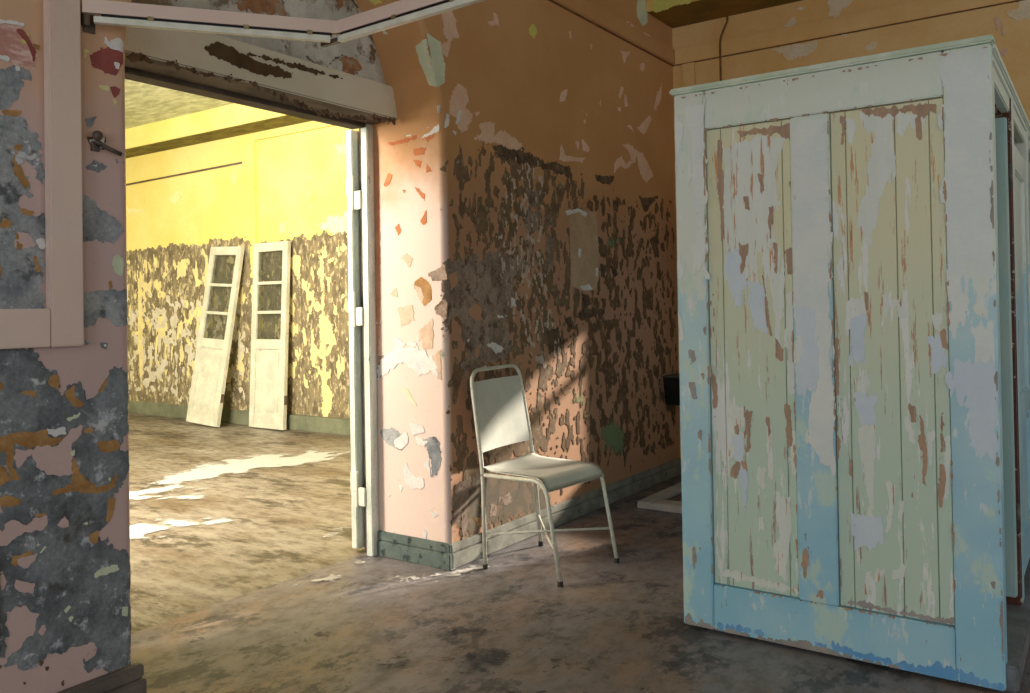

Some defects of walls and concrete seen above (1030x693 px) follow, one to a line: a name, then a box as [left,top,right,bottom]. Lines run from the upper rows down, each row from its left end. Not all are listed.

flaking render [236,0,286,16]
peeling [773,40,818,61]
peeling [994,0,1030,57]
peeling [0,19,46,309]
peeling [85,116,124,173]
peeling [373,11,696,540]
peeling [689,365,712,400]
peeling [0,195,350,685]